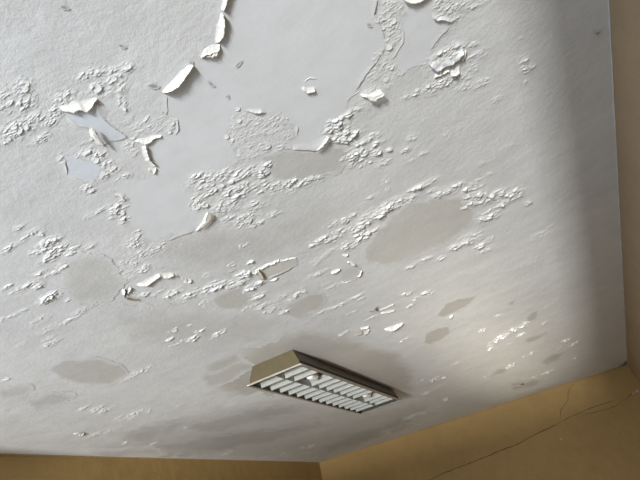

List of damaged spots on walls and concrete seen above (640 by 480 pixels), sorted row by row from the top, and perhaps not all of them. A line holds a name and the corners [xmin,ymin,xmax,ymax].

peeling [391,0,466,85]
peeling [58,98,126,147]
peeling [113,0,387,242]
flaking render [212,287,251,310]
leakage [138,191,358,278]
peeling [252,257,298,281]
leakage [0,384,78,411]
leakage [81,301,441,462]
crack [428,382,640,480]